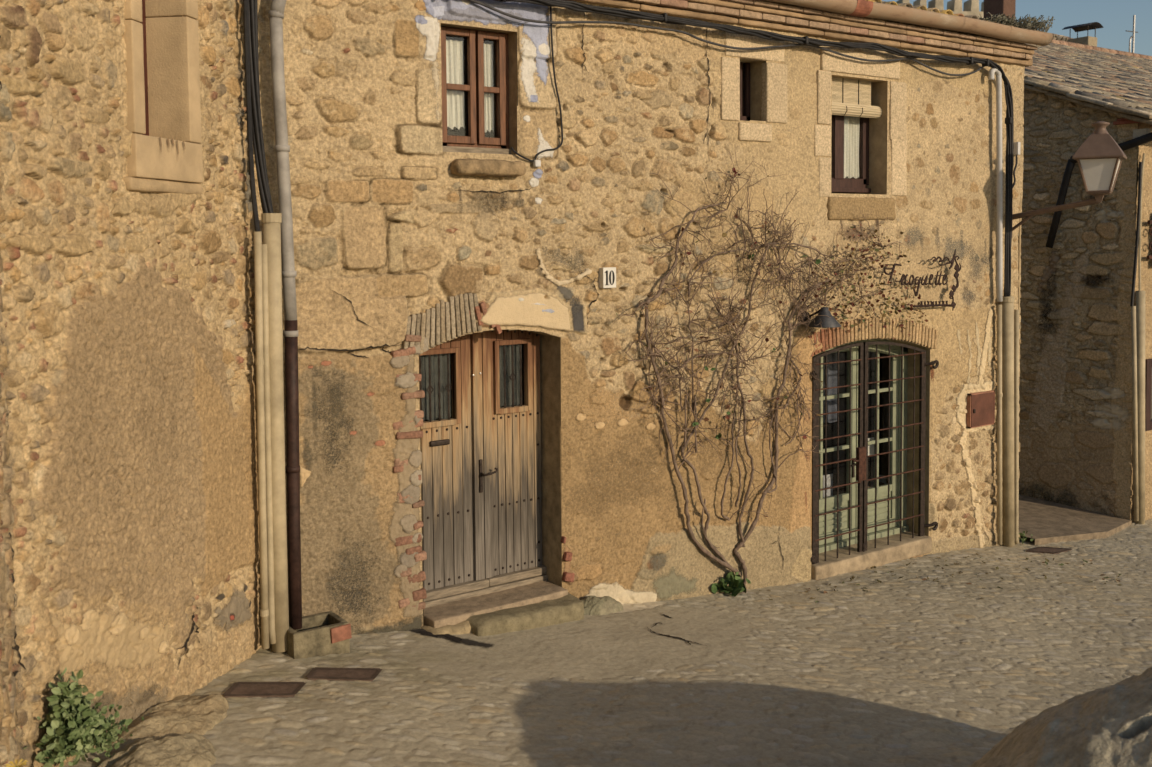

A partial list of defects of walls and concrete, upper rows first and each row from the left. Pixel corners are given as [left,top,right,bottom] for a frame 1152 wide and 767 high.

peeling [415,0,554,204]
crack [298,291,403,358]
damp [304,369,353,468]
crack [8,511,26,702]
crack [177,605,200,670]